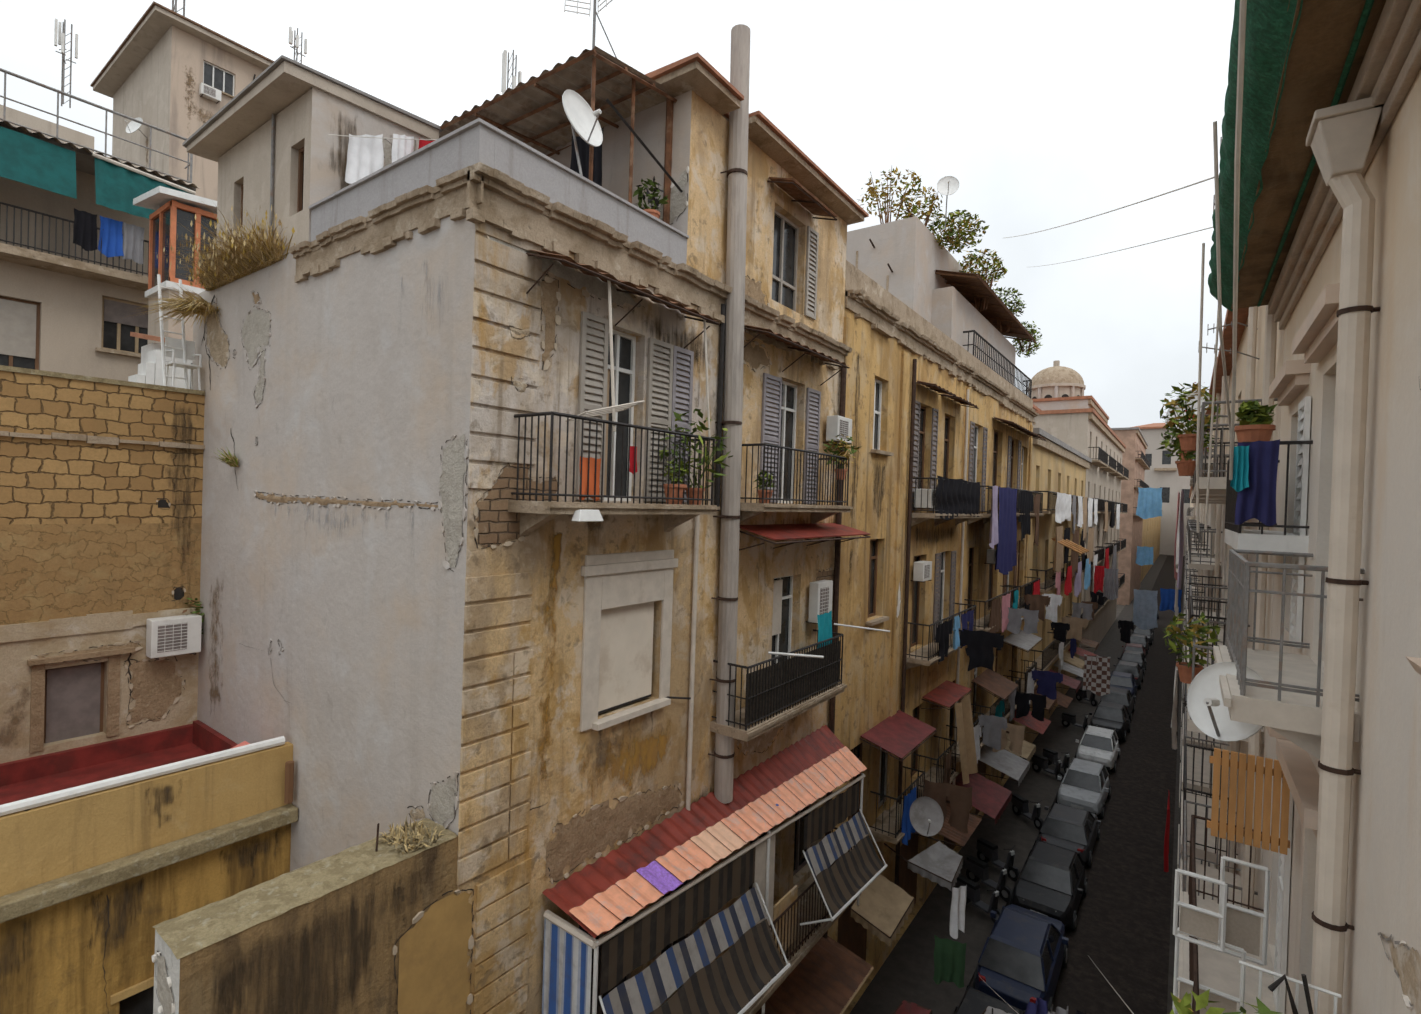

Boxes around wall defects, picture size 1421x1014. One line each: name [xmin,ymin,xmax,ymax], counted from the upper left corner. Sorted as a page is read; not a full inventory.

flaking render [204,290,271,408]
flaking render [253,434,562,572]
flaking render [30,640,185,728]
leakage [155,786,172,820]
flaking render [407,772,459,829]
flaking render [152,951,175,1014]
flaking render [1378,932,1421,1014]